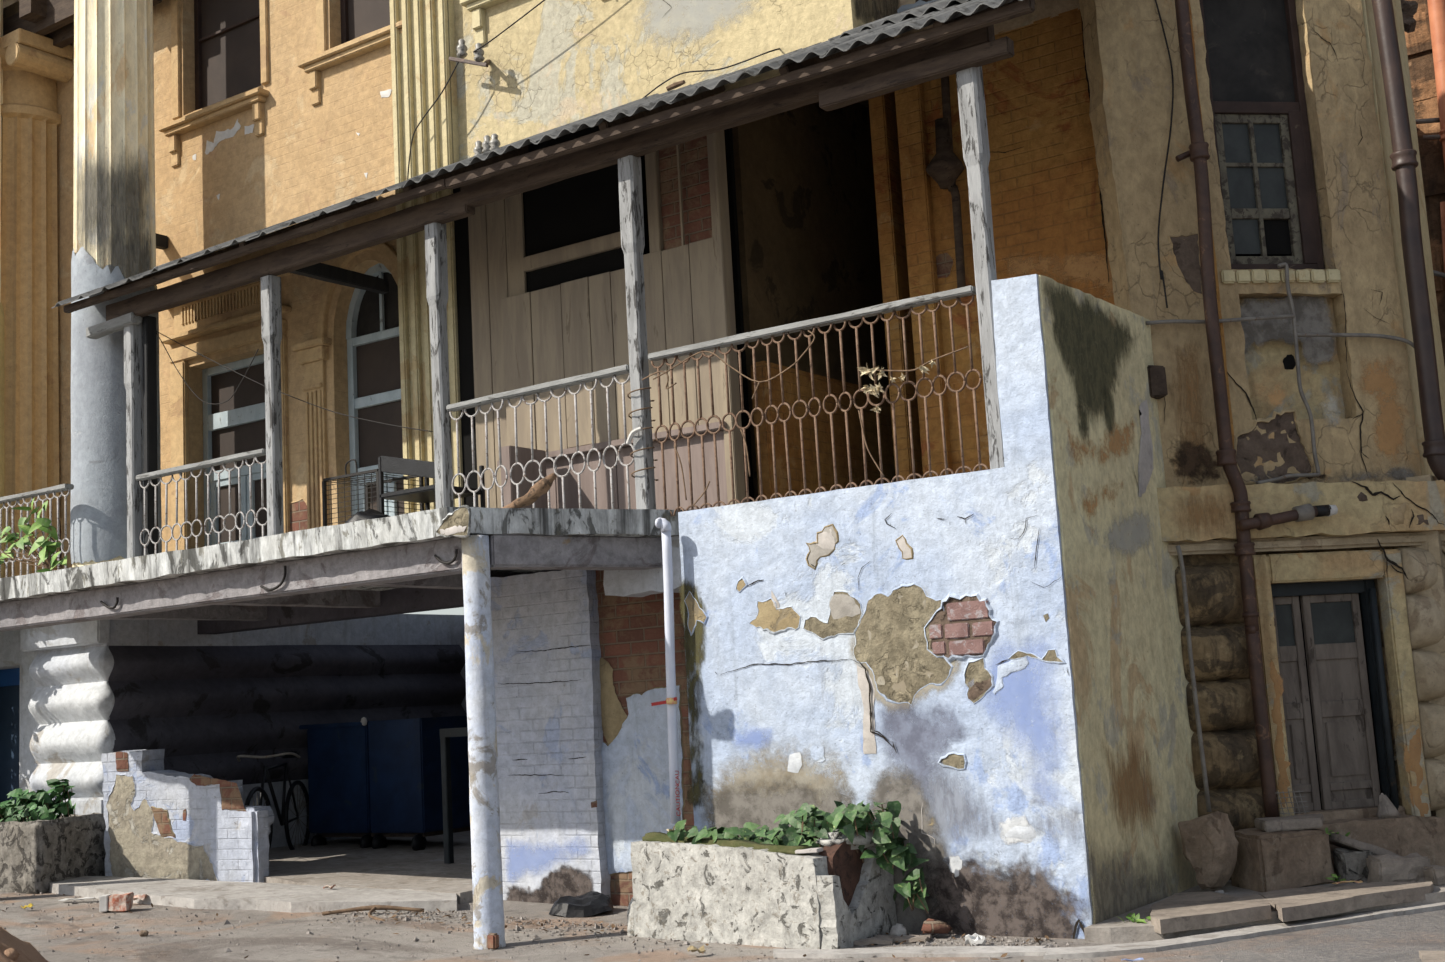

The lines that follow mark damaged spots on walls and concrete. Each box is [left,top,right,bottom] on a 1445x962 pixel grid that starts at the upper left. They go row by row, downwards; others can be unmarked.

leakage [1046,284,1134,461]
flaking render [1234,408,1314,485]
spalling [1283,354,1296,370]
crack [1341,282,1442,579]
flaking render [805,524,839,570]
flaking render [736,576,1066,706]
leakage [679,581,851,839]
crack [715,659,897,753]
flaking render [106,752,219,881]
flaking render [189,774,246,811]
leakage [851,630,1172,939]
spalling [487,933,499,950]